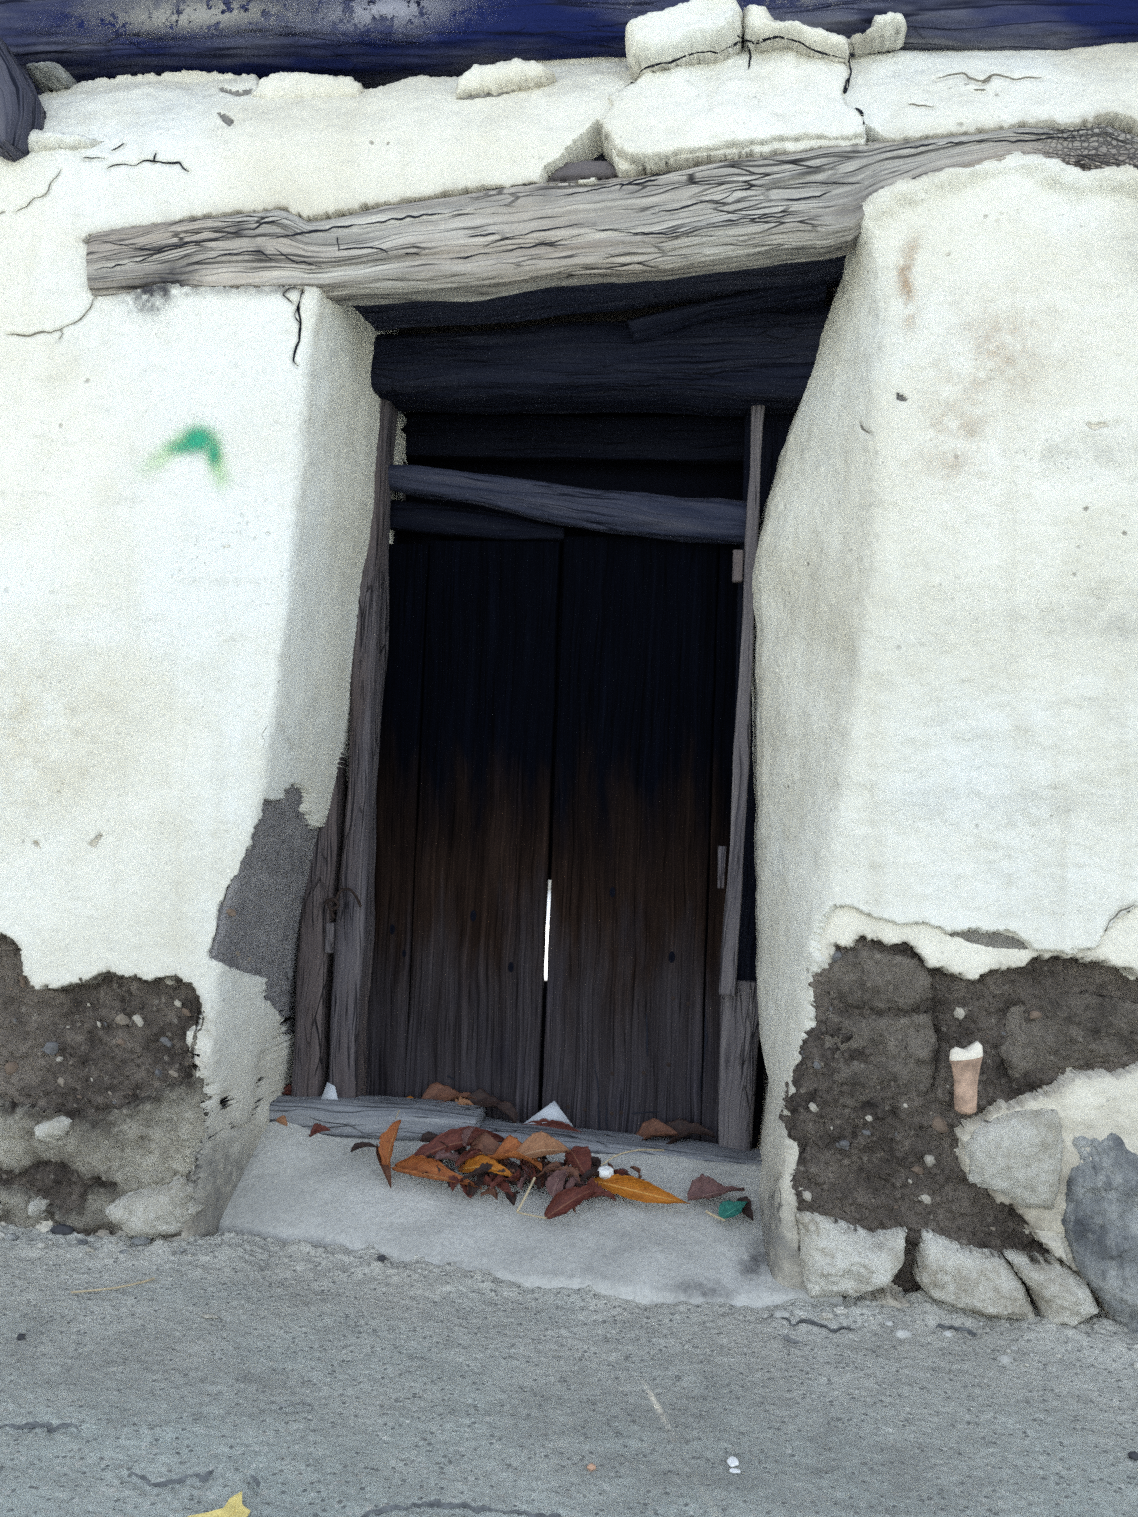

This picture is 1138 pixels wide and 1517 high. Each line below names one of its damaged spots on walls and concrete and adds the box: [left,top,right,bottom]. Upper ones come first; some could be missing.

crack [0,143,189,214]
crack [6,169,858,366]
crack [625,35,865,124]
crack [910,72,1042,107]
crack [890,129,1095,151]
spalling [208,784,319,1034]
spalling [0,933,212,1236]
spalling [779,907,1138,1320]